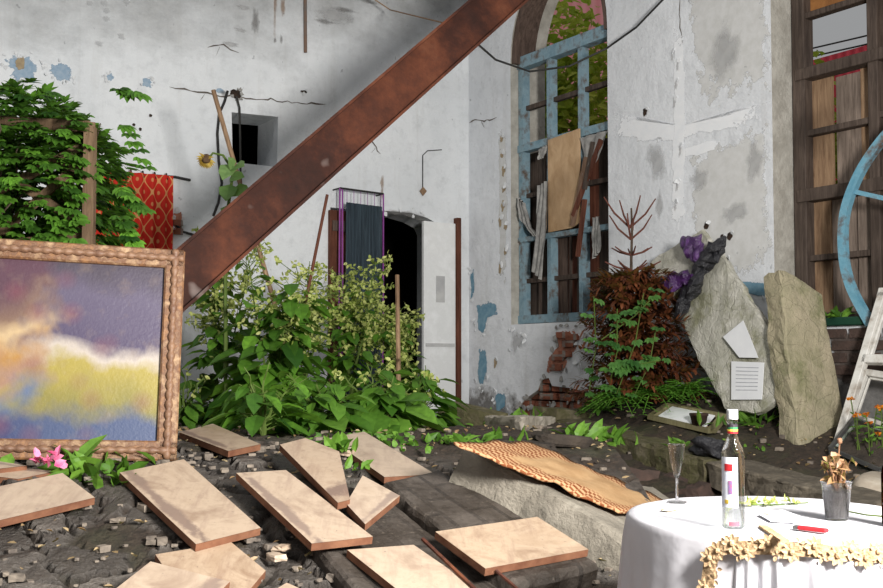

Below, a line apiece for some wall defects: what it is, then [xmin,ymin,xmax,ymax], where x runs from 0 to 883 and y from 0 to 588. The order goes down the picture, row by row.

peeling [1,51,76,84]
peeling [467,267,497,337]
flaking render [474,323,604,415]